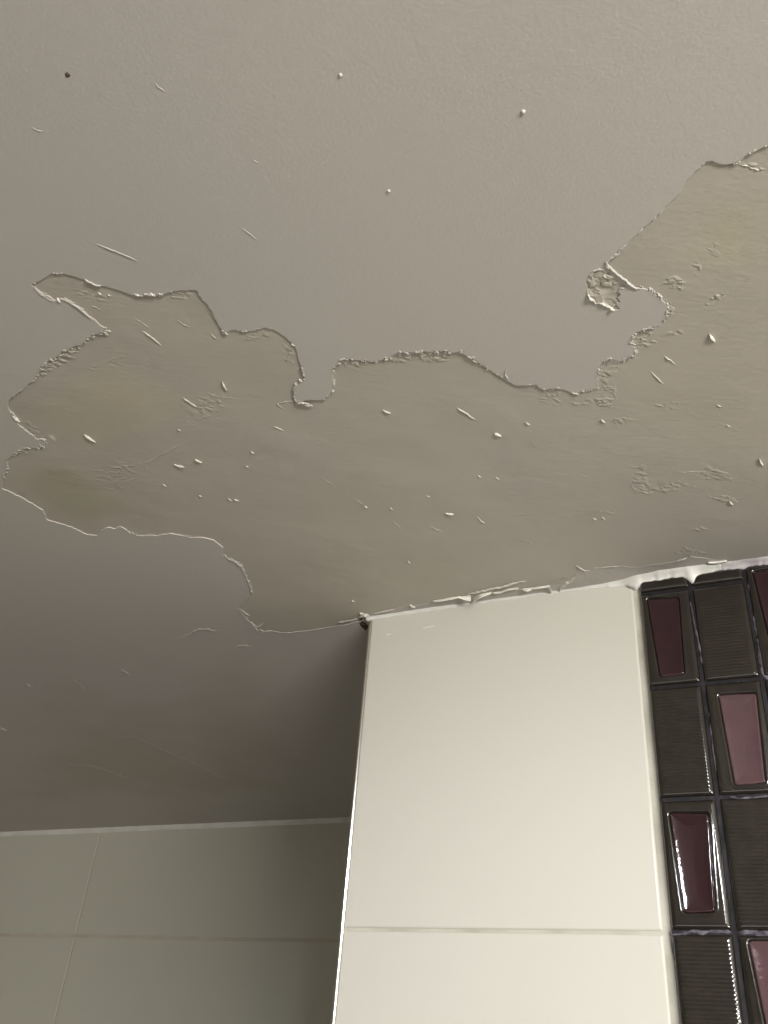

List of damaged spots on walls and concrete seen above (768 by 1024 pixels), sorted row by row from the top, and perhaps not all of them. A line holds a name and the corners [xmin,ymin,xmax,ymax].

peeling [684,145,768,184]
peeling [2,195,768,634]